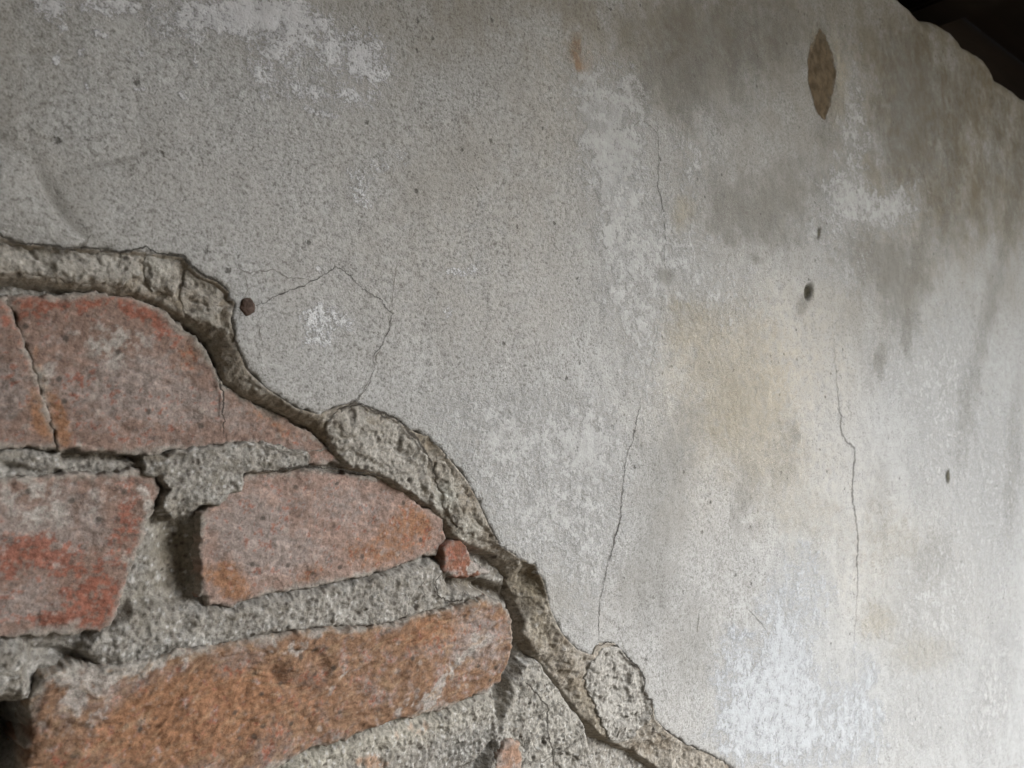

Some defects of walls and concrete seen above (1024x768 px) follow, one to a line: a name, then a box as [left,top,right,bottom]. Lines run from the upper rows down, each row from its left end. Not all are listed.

crack [0,233,438,487]
flaking render [0,237,890,768]
crack [598,419,667,740]